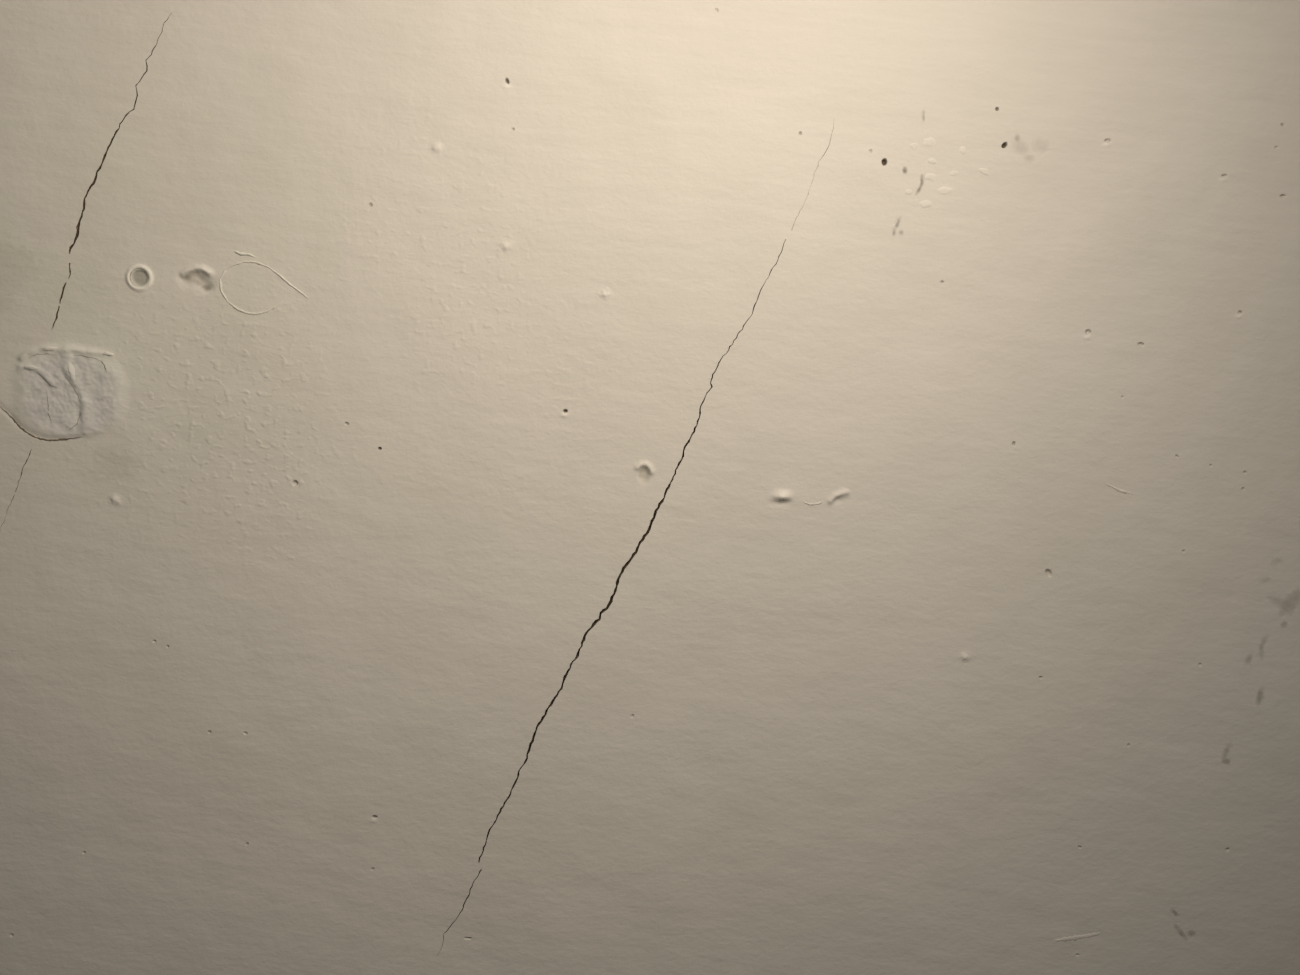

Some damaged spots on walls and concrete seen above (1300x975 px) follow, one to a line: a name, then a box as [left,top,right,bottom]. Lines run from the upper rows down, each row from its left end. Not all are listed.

crack [51,15,170,330]
crack [437,127,834,956]